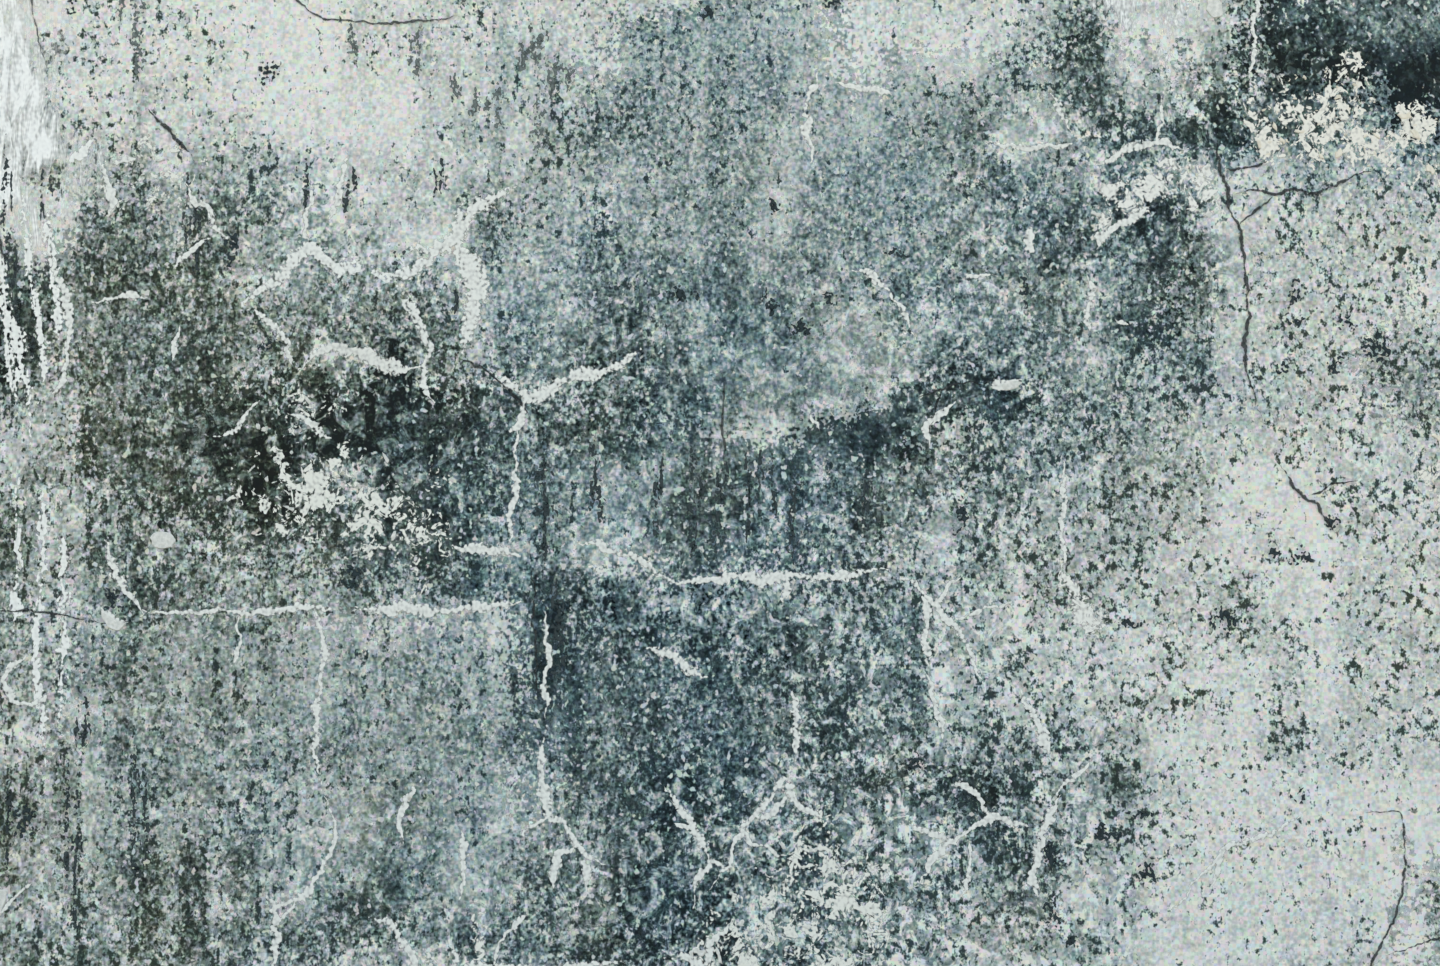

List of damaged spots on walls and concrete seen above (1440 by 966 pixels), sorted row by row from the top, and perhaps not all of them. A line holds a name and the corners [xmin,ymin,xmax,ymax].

crack [30,0,47,67]
crack [296,0,483,25]
damp [0,134,147,445]
damp [173,174,234,291]
damp [241,150,517,403]
damp [487,348,642,432]
crack [1215,119,1371,421]
damp [1334,285,1440,436]
damp [9,473,24,639]
damp [900,576,1012,739]
crack [1367,810,1440,966]
damp [1384,827,1440,966]